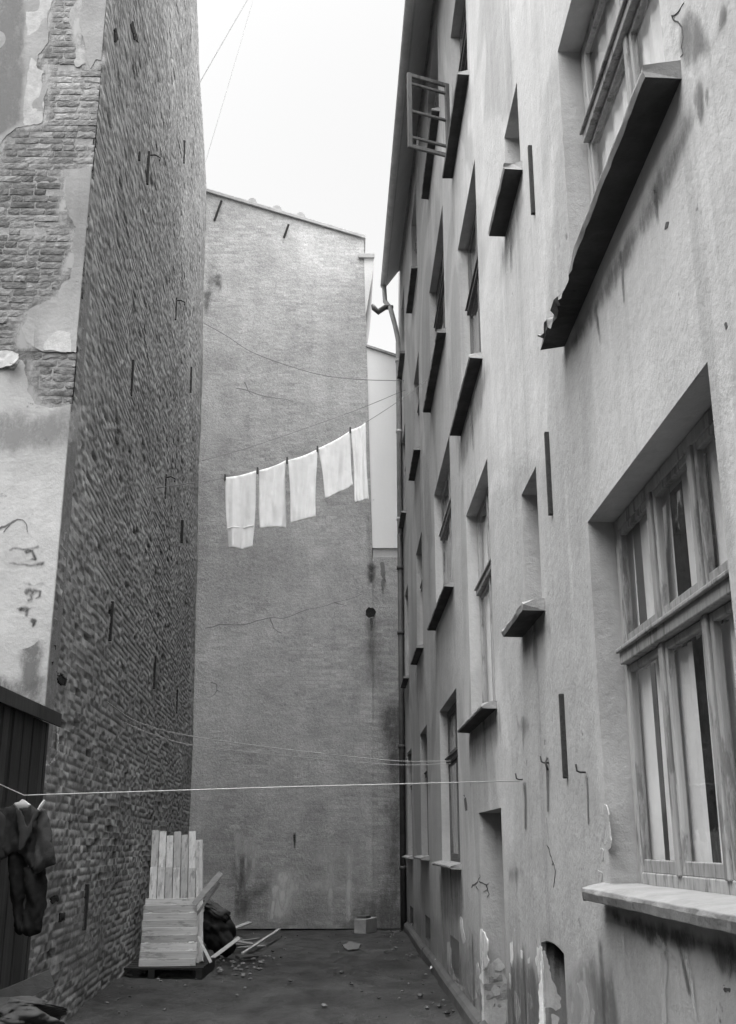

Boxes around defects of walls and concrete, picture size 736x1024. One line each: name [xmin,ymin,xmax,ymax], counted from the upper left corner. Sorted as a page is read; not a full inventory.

crack [671,3,684,57]
damp [680,17,704,58]
damp [695,83,707,118]
spalling [0,0,118,412]
damp [643,153,675,223]
crack [206,562,386,633]
spalling [447,916,595,1024]
damp [614,913,736,1023]